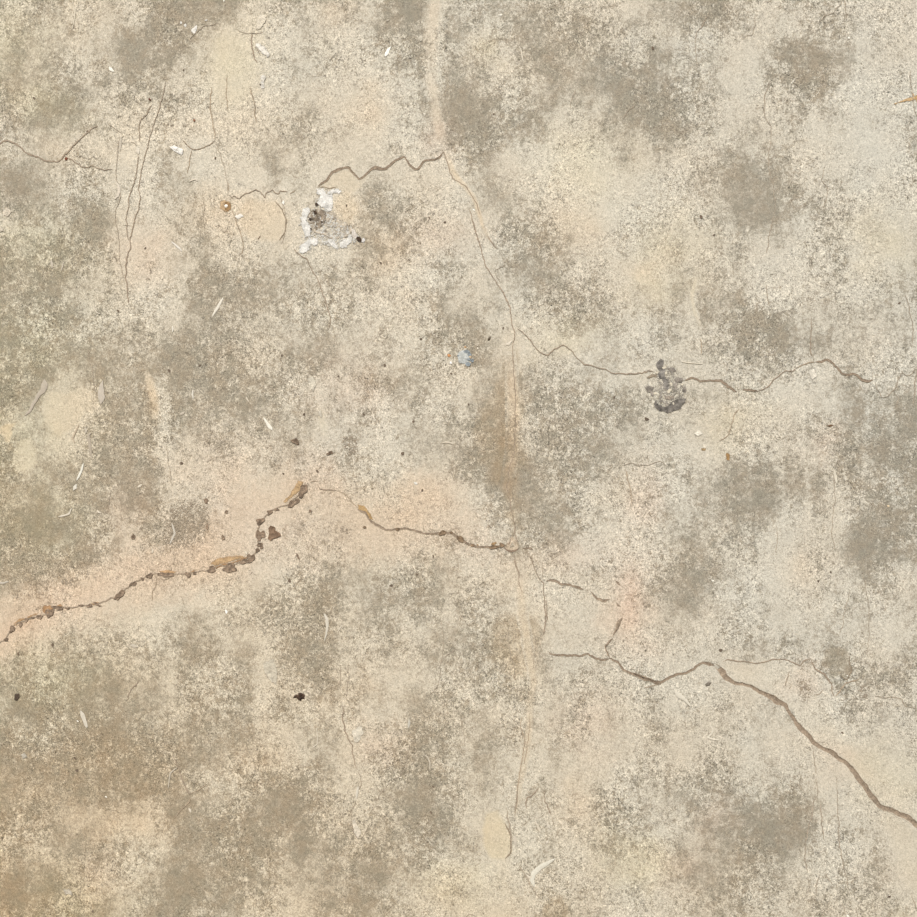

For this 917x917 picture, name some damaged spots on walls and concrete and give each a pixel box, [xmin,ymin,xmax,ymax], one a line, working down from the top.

crack [0,78,166,304]
peeling [235,168,368,254]
crack [764,83,776,251]
crack [0,481,505,643]
crack [318,150,917,900]